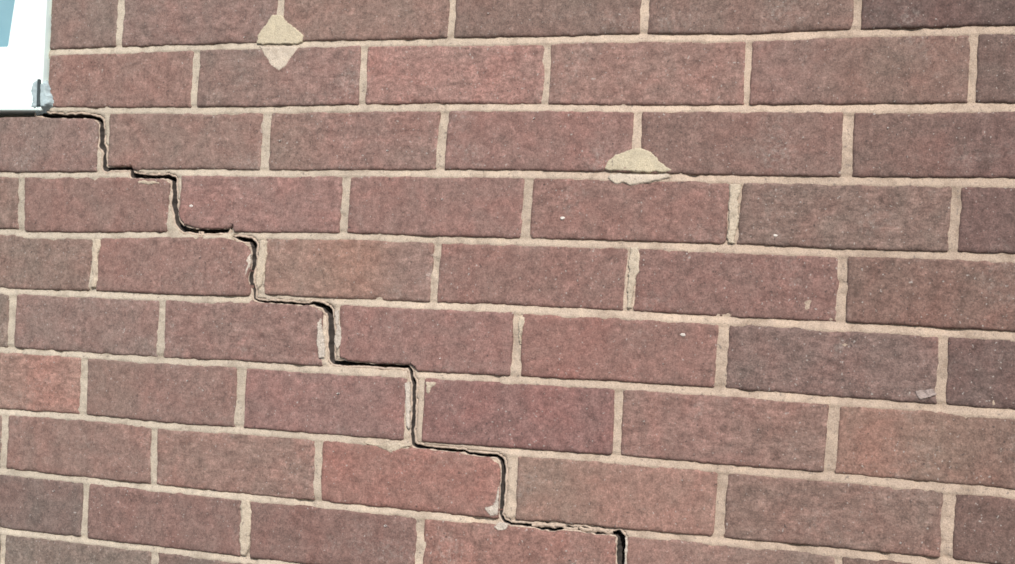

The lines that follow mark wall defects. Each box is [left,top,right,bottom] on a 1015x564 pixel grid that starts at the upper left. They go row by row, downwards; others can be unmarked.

crack [34,111,628,564]